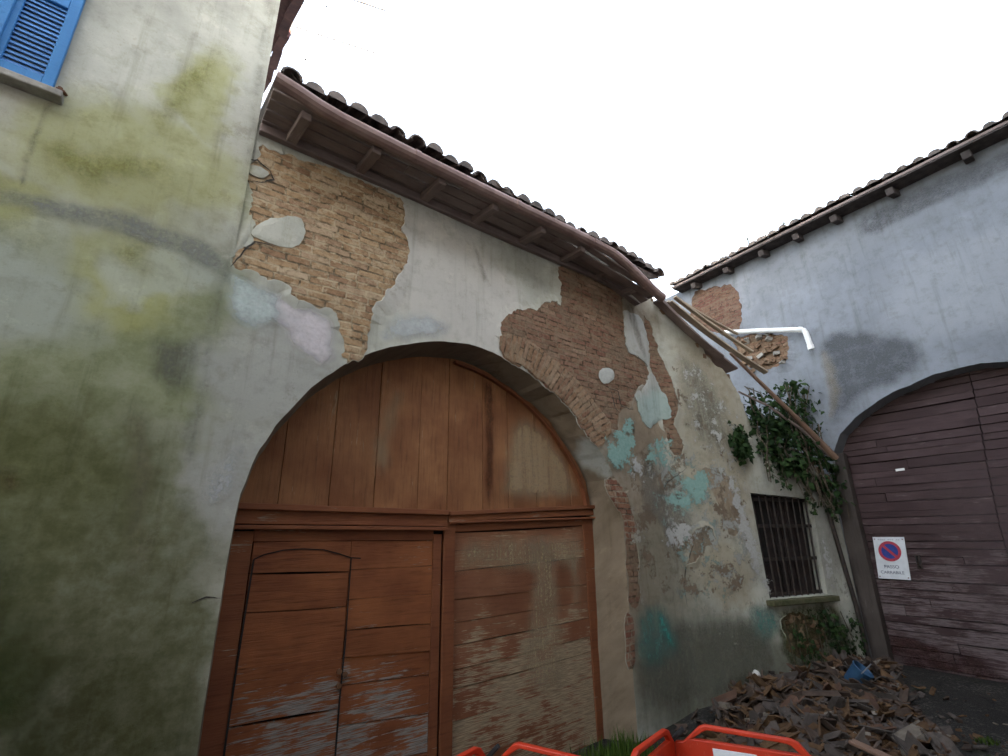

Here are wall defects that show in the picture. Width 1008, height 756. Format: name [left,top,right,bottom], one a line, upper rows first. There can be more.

spalling [218,137,420,364]
spalling [494,261,772,670]
spalling [687,279,797,374]
water stain [825,334,914,409]